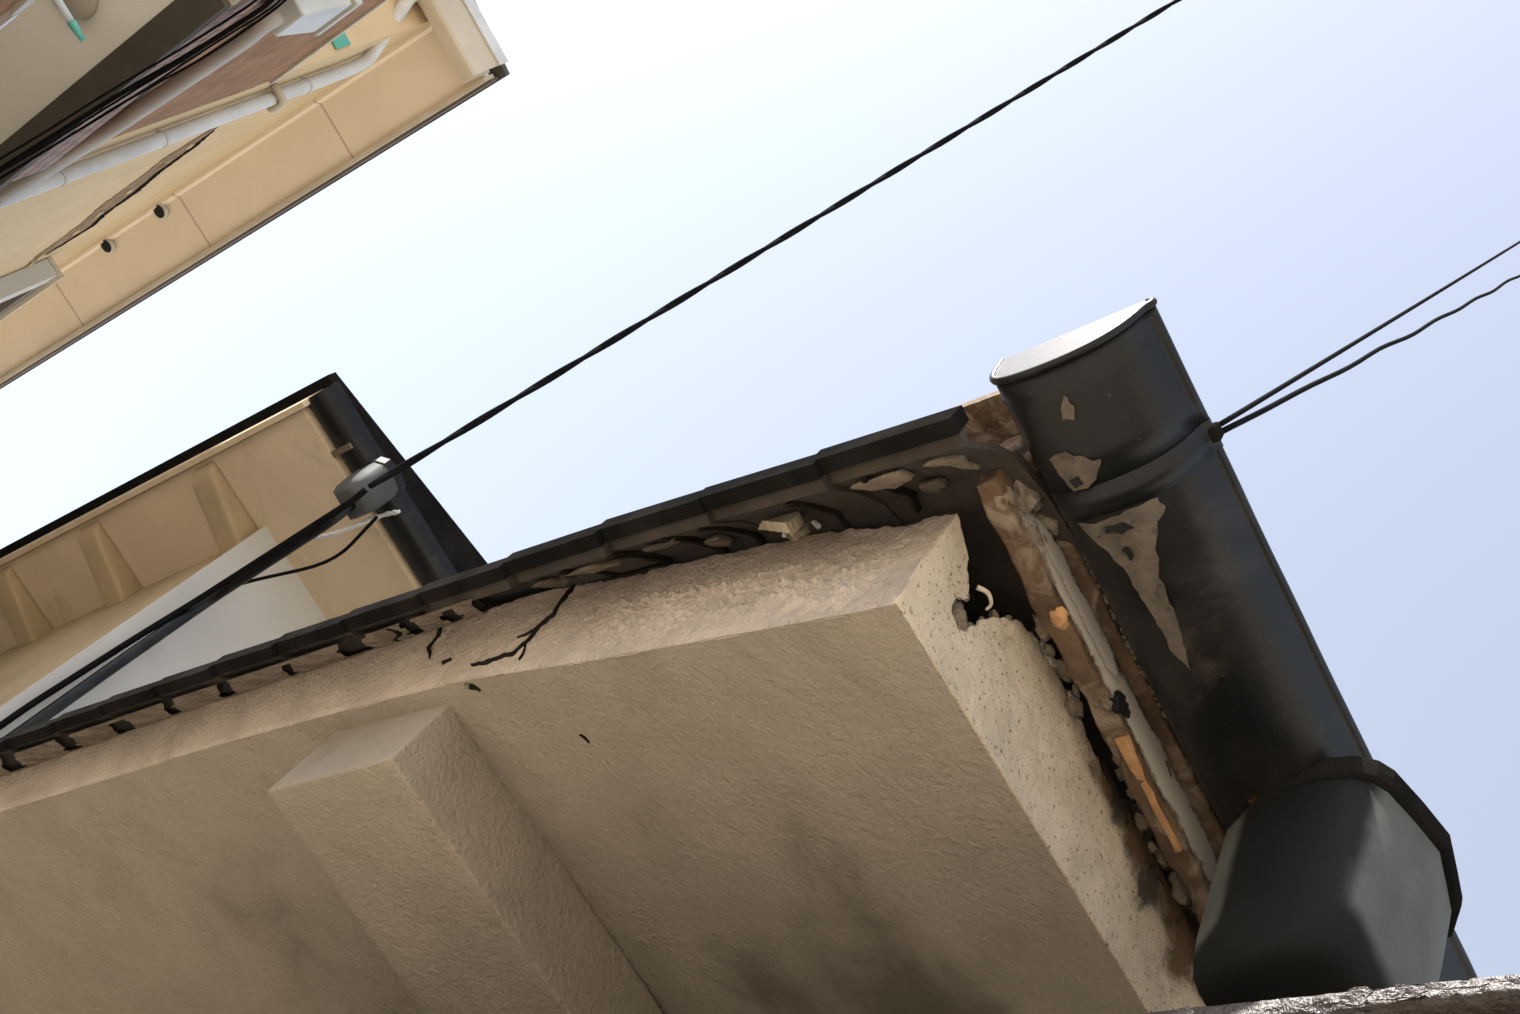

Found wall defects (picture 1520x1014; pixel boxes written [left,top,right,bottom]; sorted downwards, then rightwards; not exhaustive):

peeling [1050,451,1101,492]
spalling [993,480,1060,547]
crack [385,585,576,667]
spalling [952,585,1013,631]
peeling [1078,497,1190,671]
spalling [1032,614,1196,914]